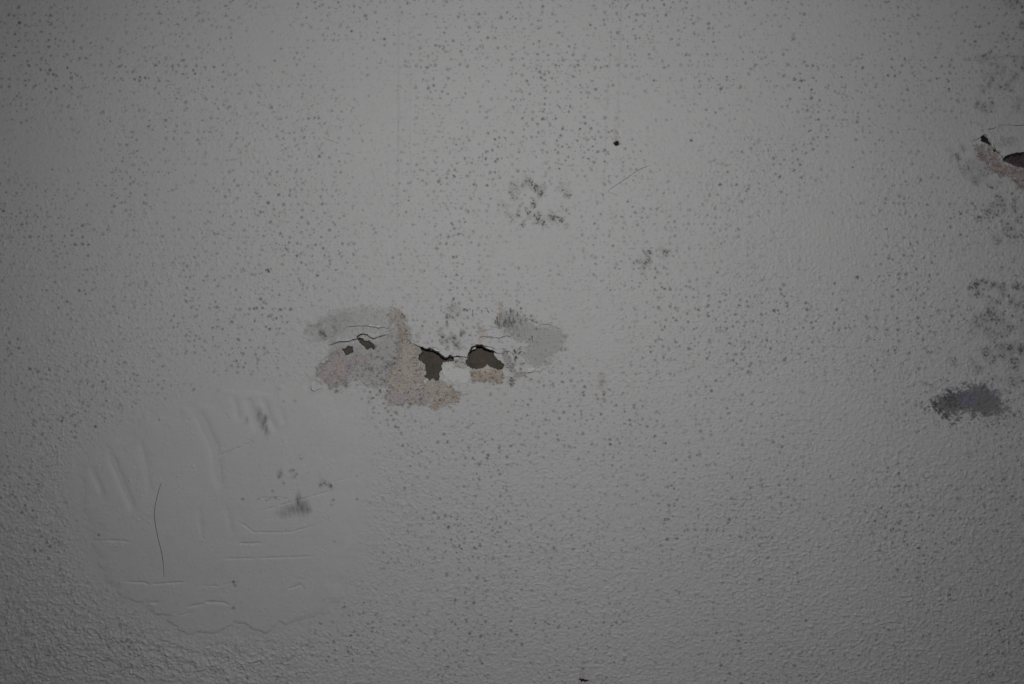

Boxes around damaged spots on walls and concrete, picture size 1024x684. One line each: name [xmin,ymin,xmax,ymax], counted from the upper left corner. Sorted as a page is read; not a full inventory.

peeling [973,136,1024,189]
peeling [316,306,536,410]
damp [924,379,1003,425]